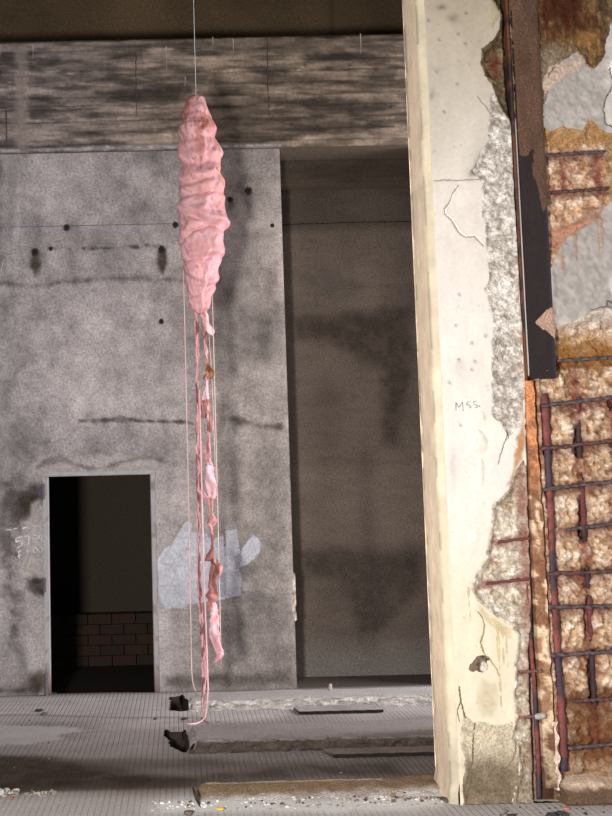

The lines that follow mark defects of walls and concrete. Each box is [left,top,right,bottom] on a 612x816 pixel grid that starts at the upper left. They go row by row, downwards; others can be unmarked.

rust [577,32,600,64]
crack [434,179,485,246]
spalling [473,0,612,778]
rust [515,381,558,788]
crack [477,611,499,676]
spalling [460,460,537,805]
crack [457,686,466,722]
rust [570,691,612,756]
peeling [546,788,571,816]